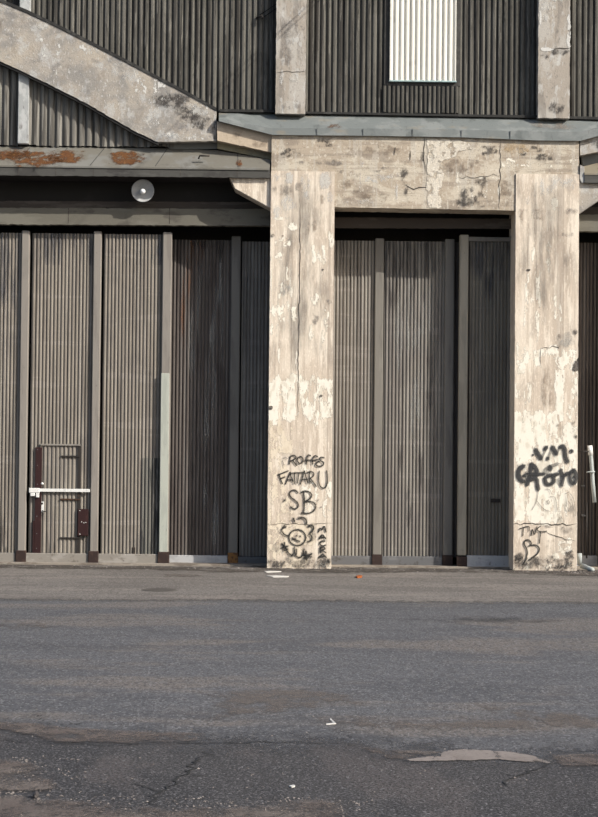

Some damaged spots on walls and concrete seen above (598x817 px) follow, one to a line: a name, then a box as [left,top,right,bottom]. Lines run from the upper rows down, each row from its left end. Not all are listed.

rust [0,150,84,167]
rust [111,151,144,165]
crack [394,138,426,191]
crack [464,140,501,202]
peeling [270,216,298,336]
peeling [311,231,334,270]
peeling [514,241,578,528]
peeling [267,351,333,569]